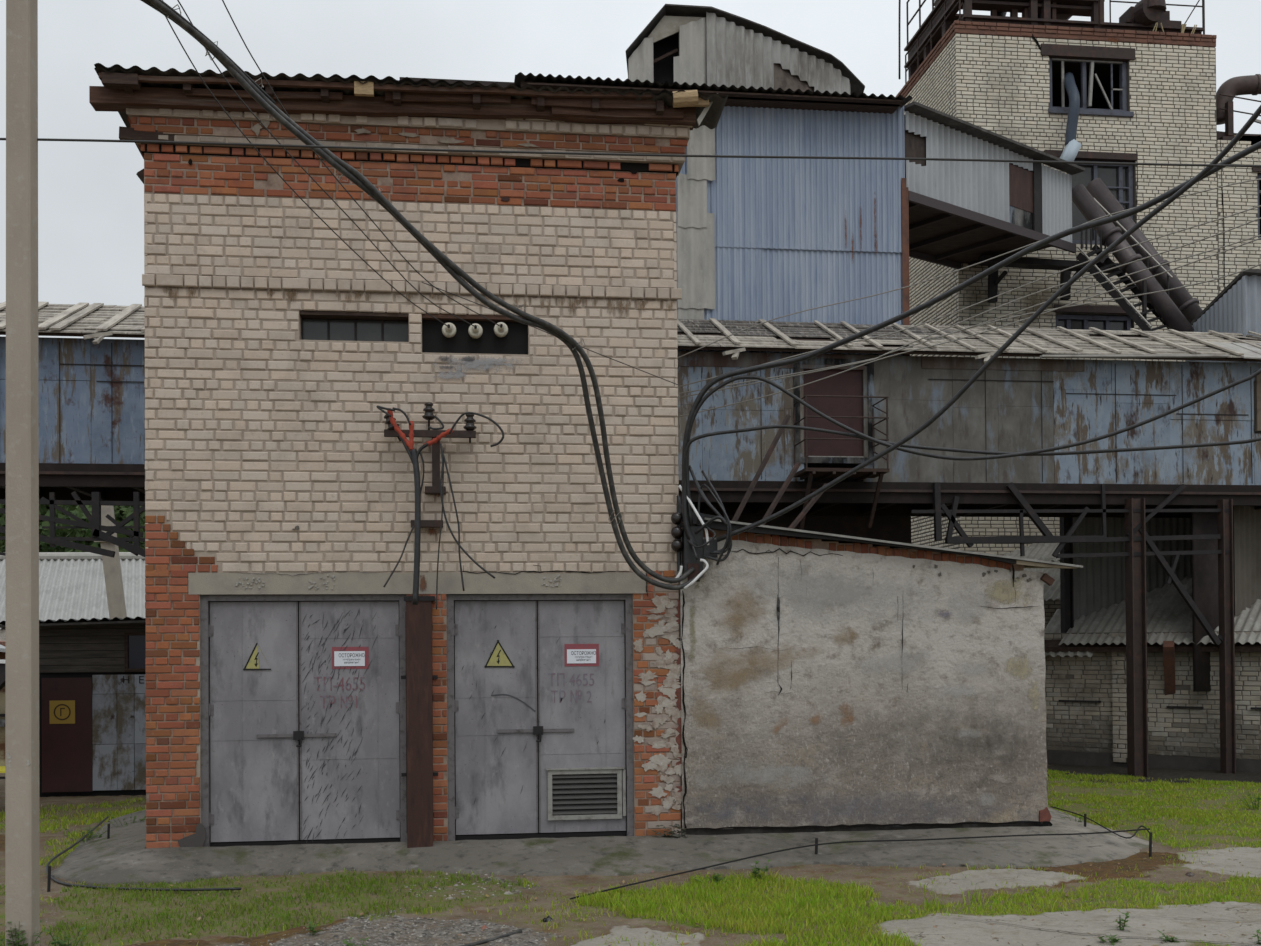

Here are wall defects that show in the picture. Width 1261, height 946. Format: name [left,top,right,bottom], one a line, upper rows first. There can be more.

corrosion [845,199,877,259]
crack [462,565,648,596]
crack [719,548,843,695]
crack [981,564,1037,609]
peeling [633,595,682,816]
crack [681,590,1035,830]